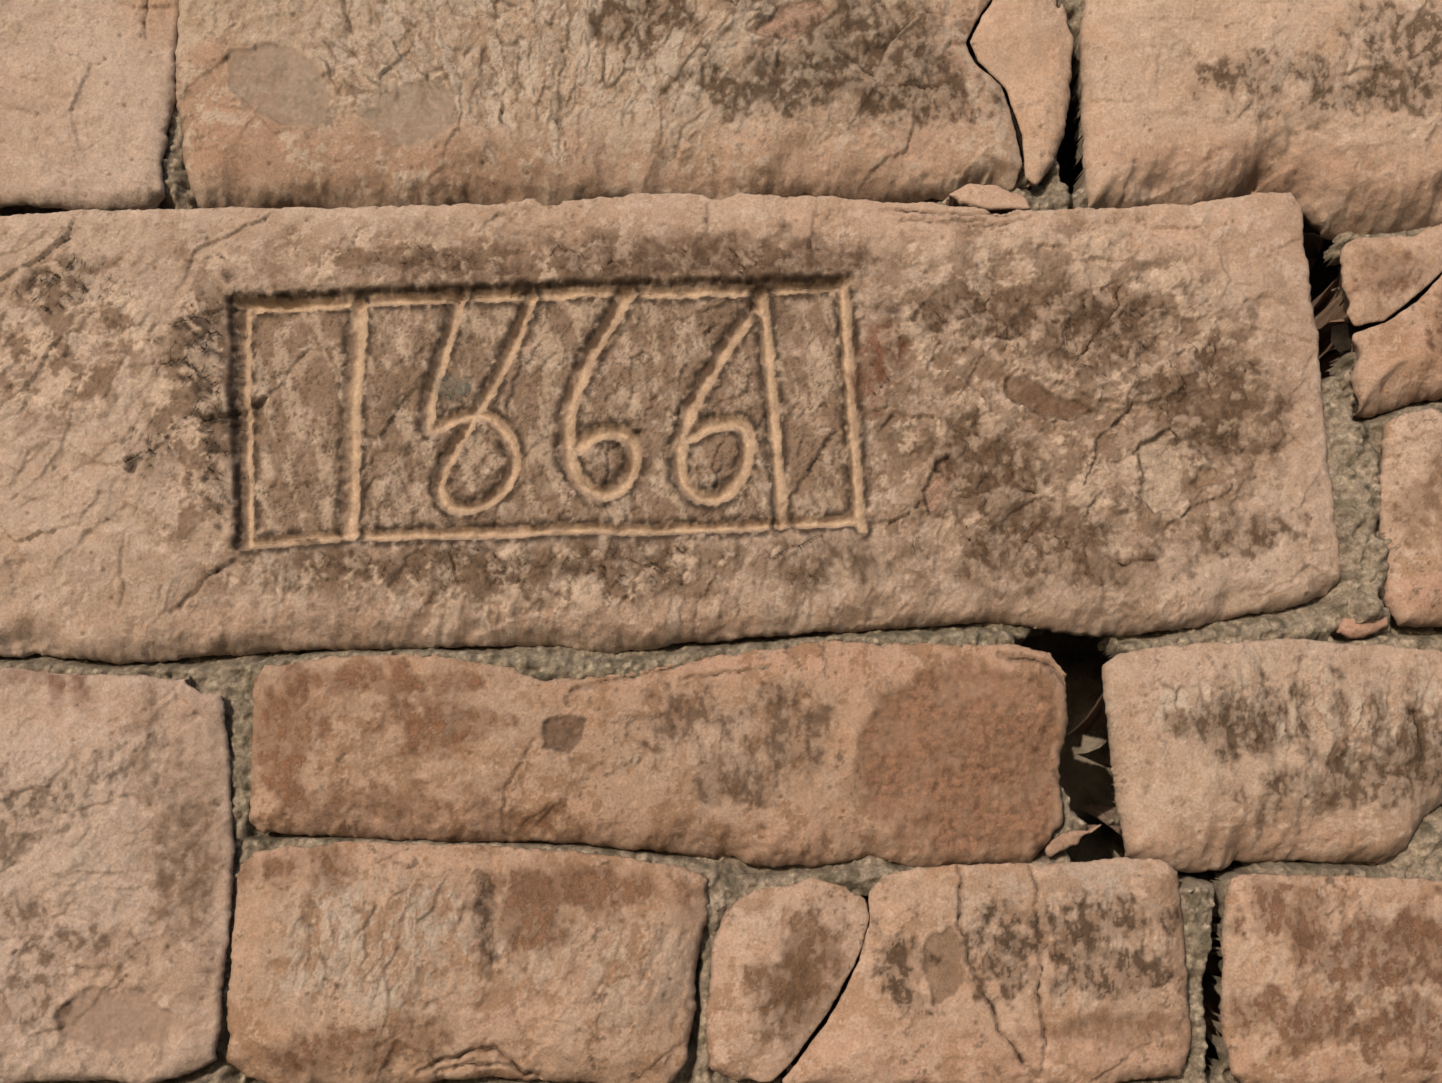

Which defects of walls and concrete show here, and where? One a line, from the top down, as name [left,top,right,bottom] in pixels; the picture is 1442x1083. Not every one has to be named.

crack [966,0,1032,191]
crack [1331,272,1442,352]
crack [987,966,1047,1064]